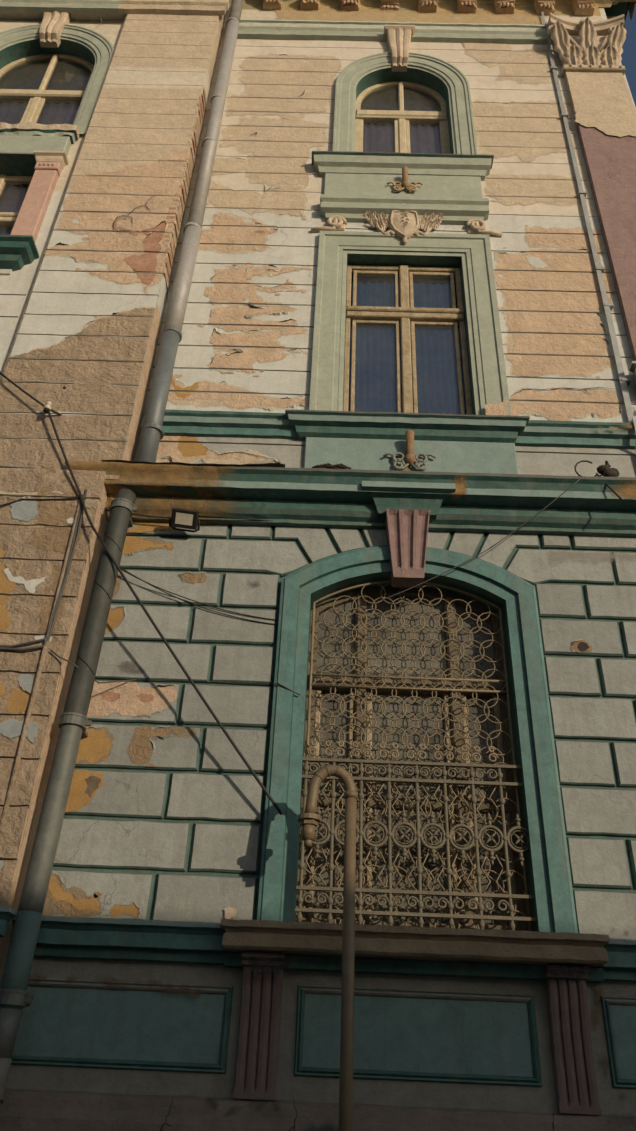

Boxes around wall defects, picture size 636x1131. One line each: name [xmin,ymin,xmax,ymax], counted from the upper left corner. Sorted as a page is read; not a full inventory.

peeling [167,53,342,411]
peeling [0,87,208,642]
peeling [485,225,624,421]
rust [65,461,226,524]
peeling [0,674,38,743]
spalling [65,675,197,812]
peeling [42,871,142,919]